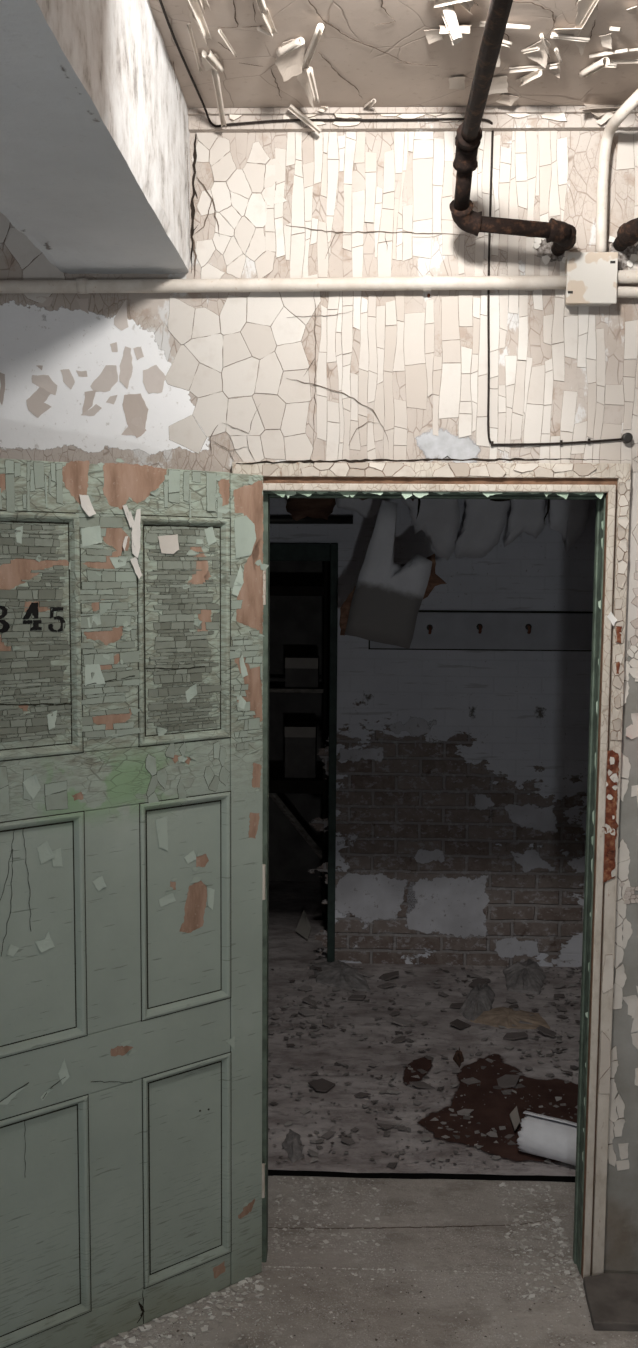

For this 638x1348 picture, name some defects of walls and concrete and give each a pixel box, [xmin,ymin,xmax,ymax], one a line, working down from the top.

crack [218,0,281,97]
flaking render [0,212,217,590]
crack [0,135,638,803]
peeling [84,599,132,686]
peeling [187,0,638,1274]
peeling [47,710,57,730]
peeling [92,707,140,738]
peeling [185,684,197,703]